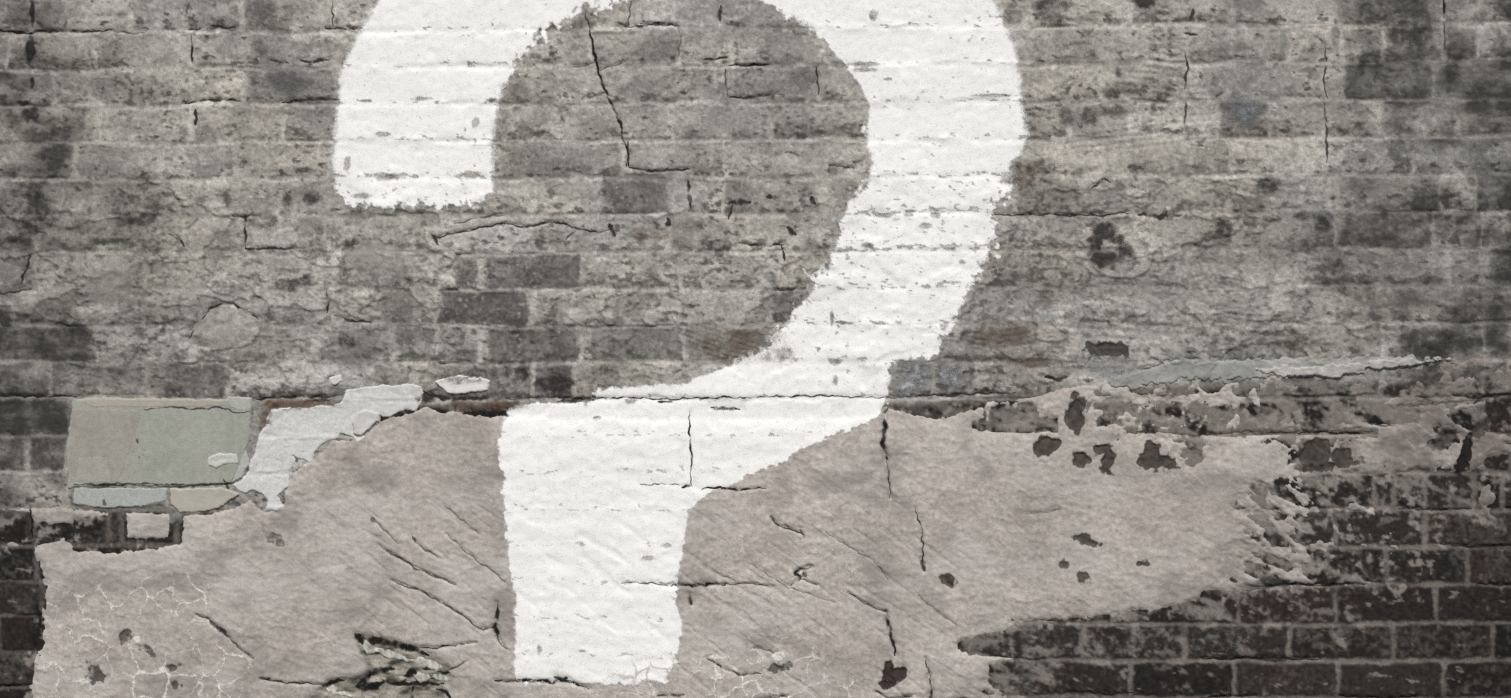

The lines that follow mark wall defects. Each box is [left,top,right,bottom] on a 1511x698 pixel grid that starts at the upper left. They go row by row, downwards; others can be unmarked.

crack [573,0,769,226]
crack [431,214,616,245]
crack [728,164,853,261]
crack [1140,357,1198,370]
crack [144,394,340,413]
peeling [208,375,490,512]
spalling [1033,391,1116,475]
spalling [1136,440,1180,472]
spalling [1295,437,1365,472]
spalling [1436,421,1486,477]
crack [371,353,1101,698]
spalling [315,633,453,698]